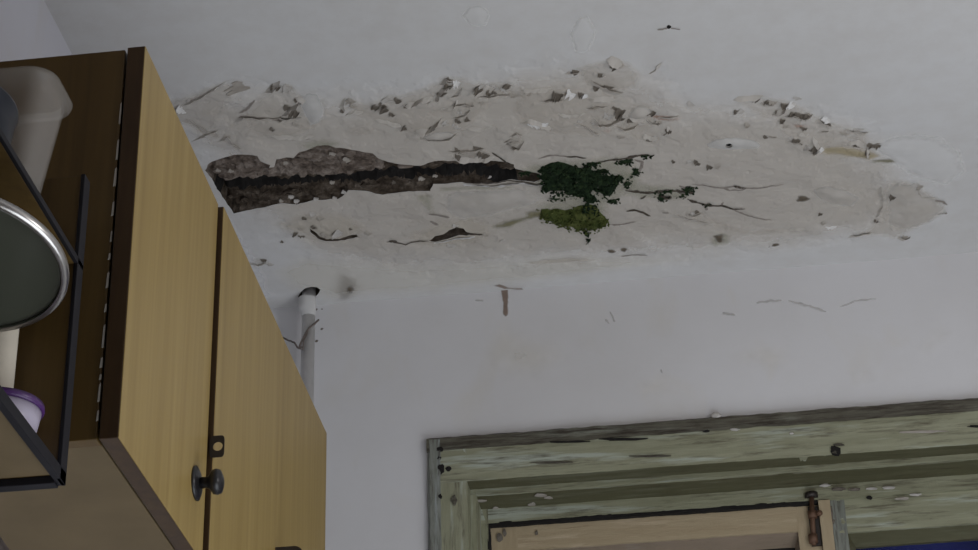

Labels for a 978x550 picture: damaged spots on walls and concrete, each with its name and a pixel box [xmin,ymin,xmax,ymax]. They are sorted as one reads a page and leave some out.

flaking render [176,56,679,213]
peeling [733,95,882,160]
water stain [222,79,895,263]
peeling [848,187,911,241]
corrosion [496,285,522,316]